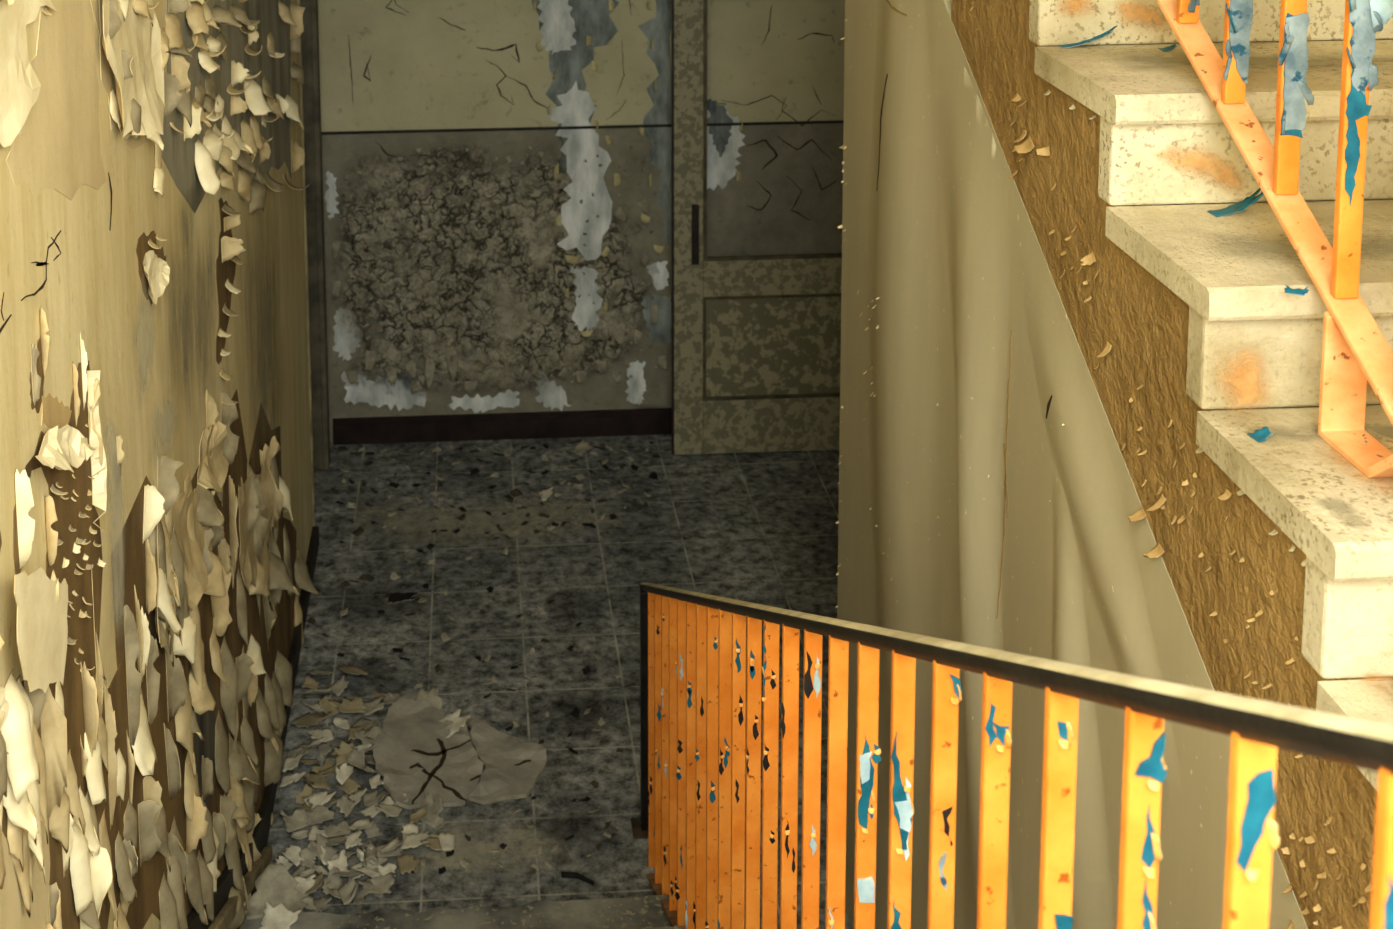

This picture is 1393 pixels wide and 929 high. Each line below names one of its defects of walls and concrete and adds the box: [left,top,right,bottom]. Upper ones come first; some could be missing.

crack [0,230,61,333]
peeling [0,0,340,929]
crack [385,0,547,108]
peeling [331,0,672,413]